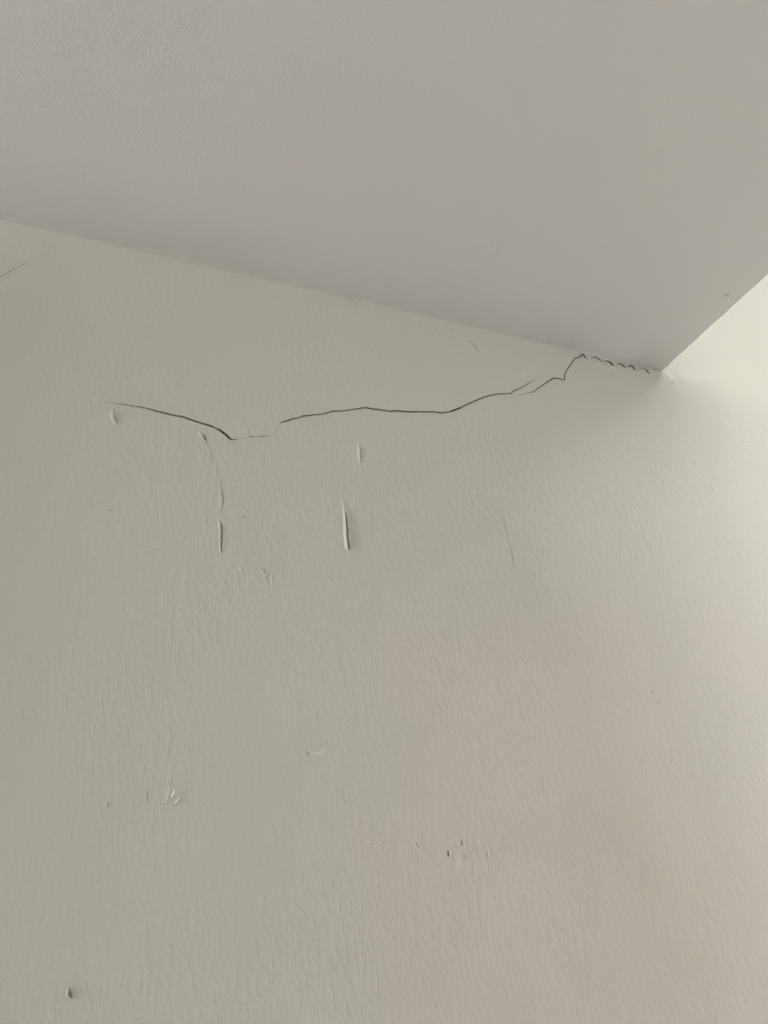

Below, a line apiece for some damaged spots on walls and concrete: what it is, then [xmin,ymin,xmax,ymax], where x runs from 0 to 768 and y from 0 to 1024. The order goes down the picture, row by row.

crack [136,354,654,443]
crack [216,480,224,554]